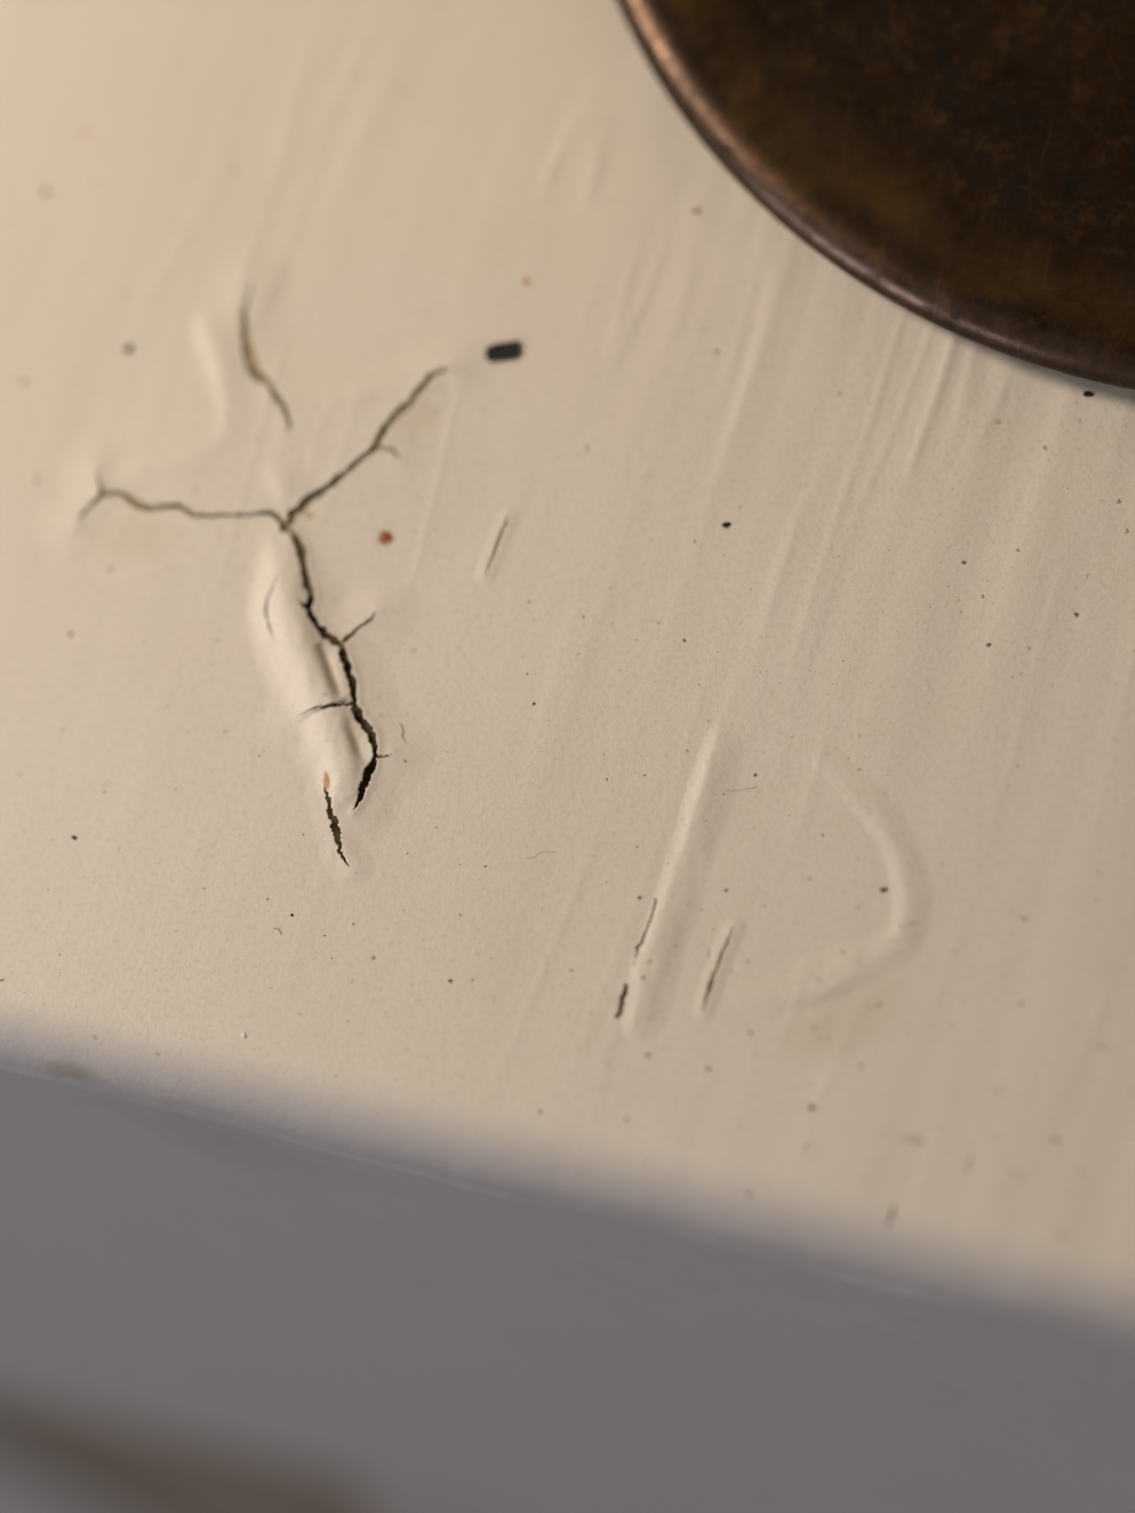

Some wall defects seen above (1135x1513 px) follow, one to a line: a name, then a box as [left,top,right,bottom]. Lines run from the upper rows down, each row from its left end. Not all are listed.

crack [241,283,292,432]
crack [76,369,452,866]
crack [615,898,657,1019]
crack [691,916,747,1023]